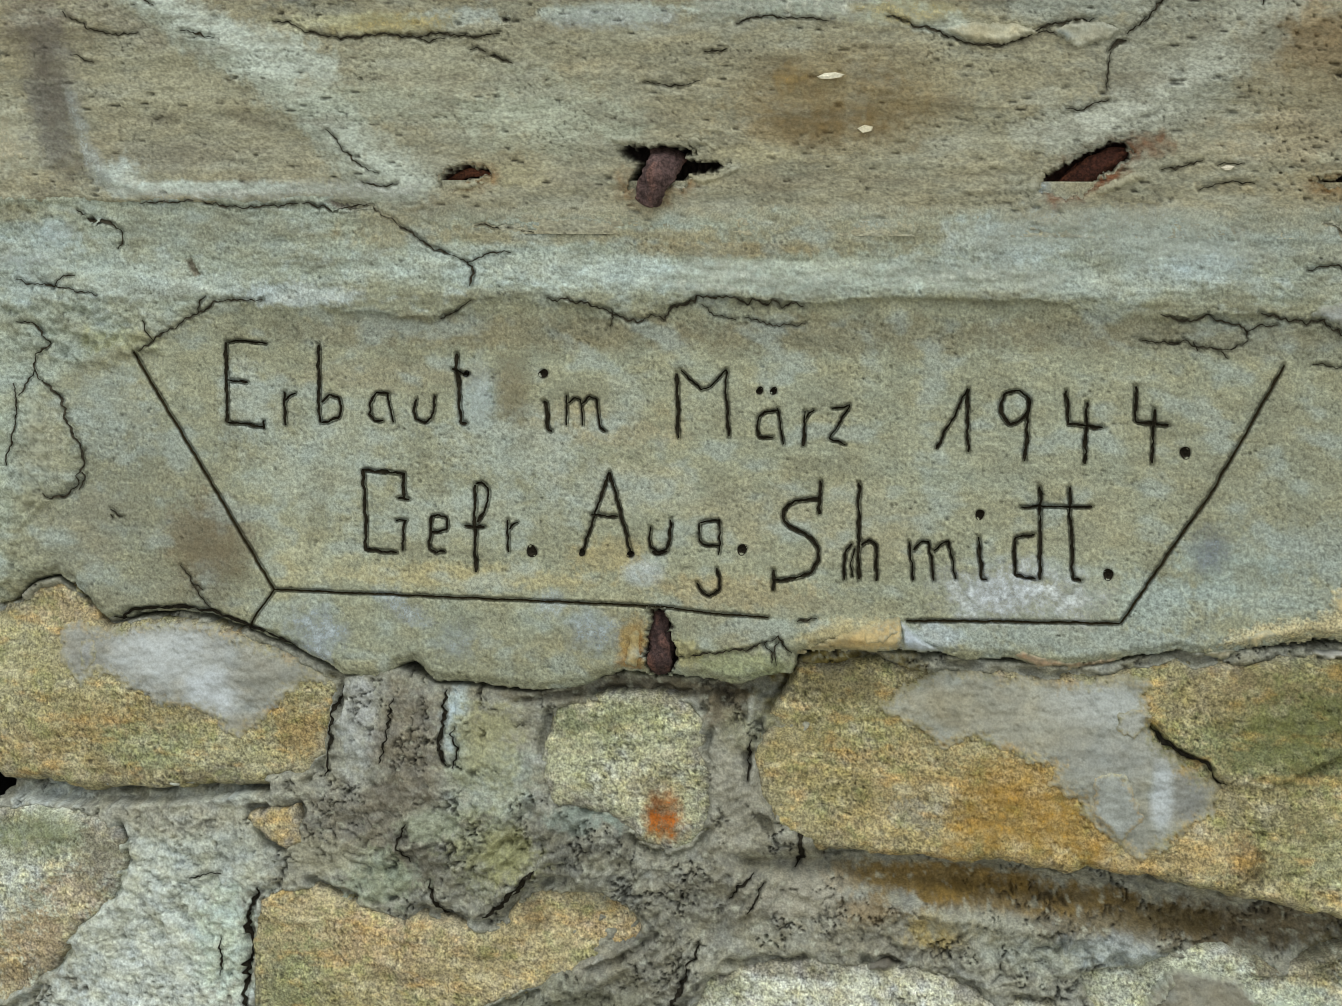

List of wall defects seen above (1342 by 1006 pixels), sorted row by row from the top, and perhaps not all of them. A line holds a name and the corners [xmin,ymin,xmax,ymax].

crack [887,0,1164,111]
crack [76,209,123,249]
crack [141,129,534,319]
crack [1150,726,1226,785]
corrosion [649,801,678,837]